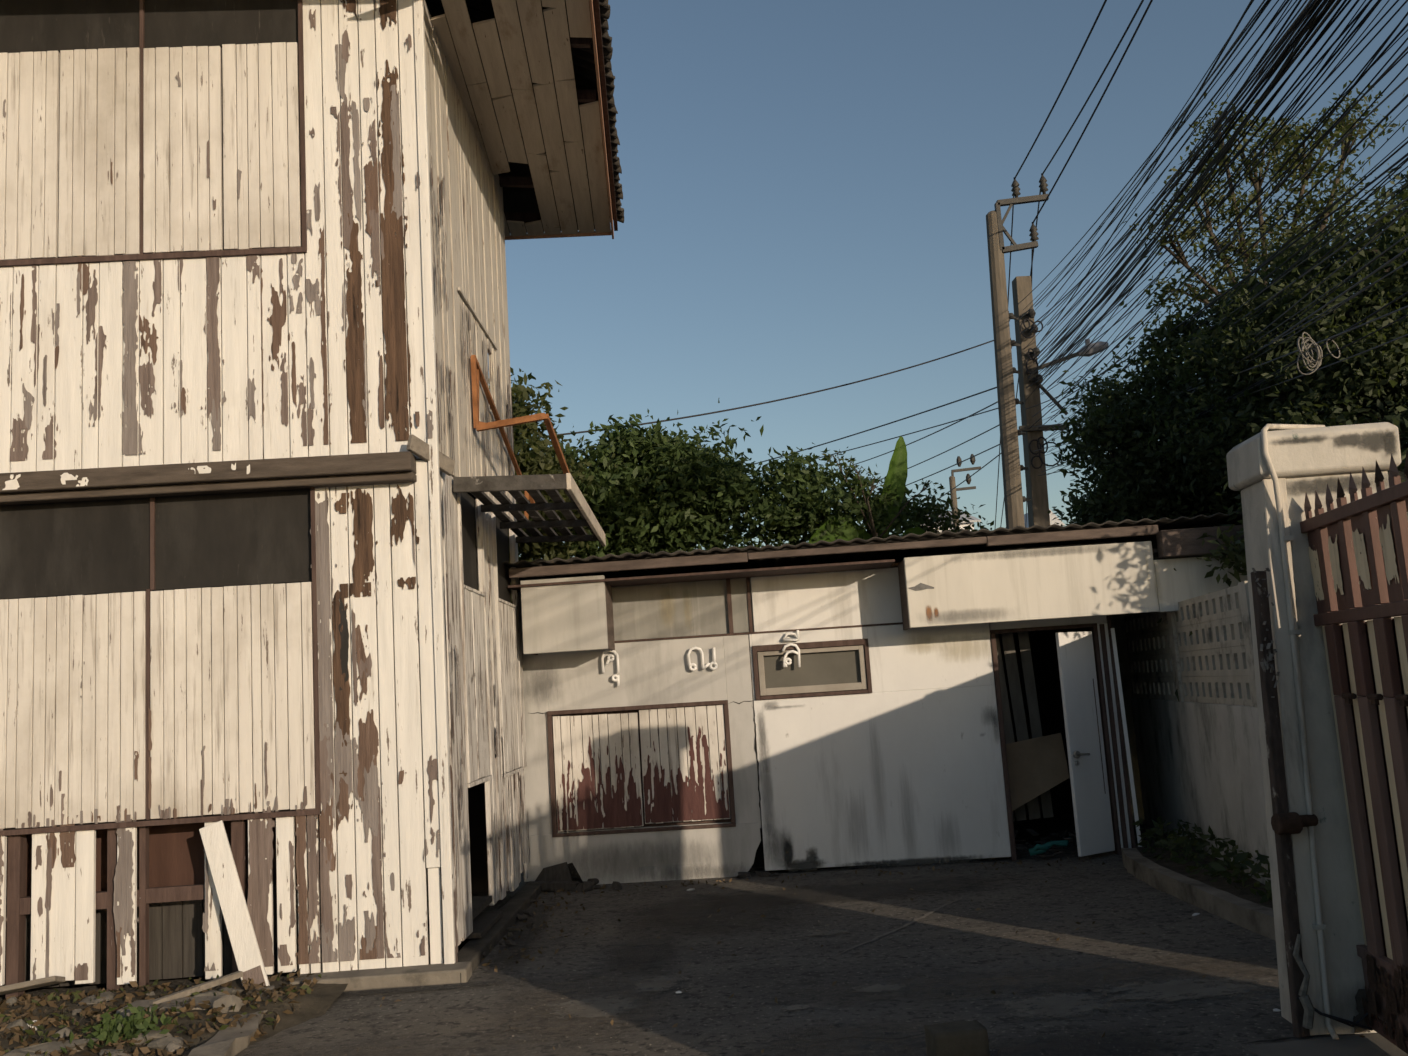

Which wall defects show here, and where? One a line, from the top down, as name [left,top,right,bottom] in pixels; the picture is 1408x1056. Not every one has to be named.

peeling [0,256,107,490]
peeling [120,251,183,455]
peeling [171,243,226,474]
peeling [246,0,514,495]
damp [1278,433,1396,454]
peeling [1308,514,1399,601]
peeling [21,708,177,981]
peeling [200,484,419,967]
peeling [423,573,530,962]